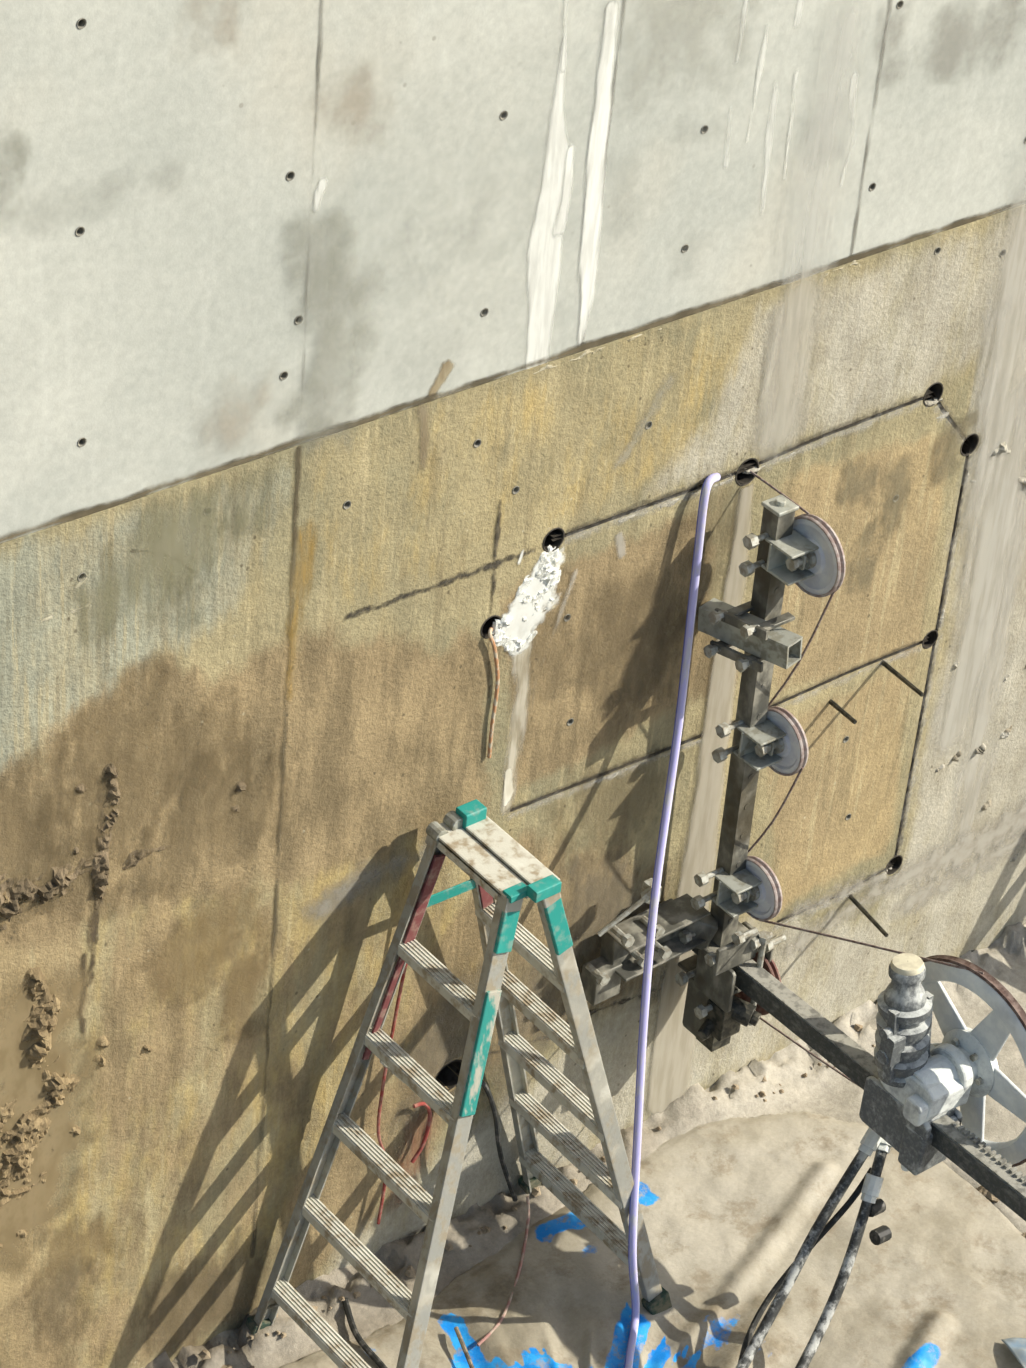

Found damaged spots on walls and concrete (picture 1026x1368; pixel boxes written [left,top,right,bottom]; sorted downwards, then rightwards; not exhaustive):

leakage [526,1,618,369]
spalling [961,467,994,486]
spalling [990,442,1011,456]
spalling [935,725,1012,773]
leakage [160,895,262,1036]
leakage [407,999,470,1077]
leakage [531,979,566,1016]
leakage [572,868,648,973]
leakage [45,1219,110,1329]
leakage [149,1246,268,1351]